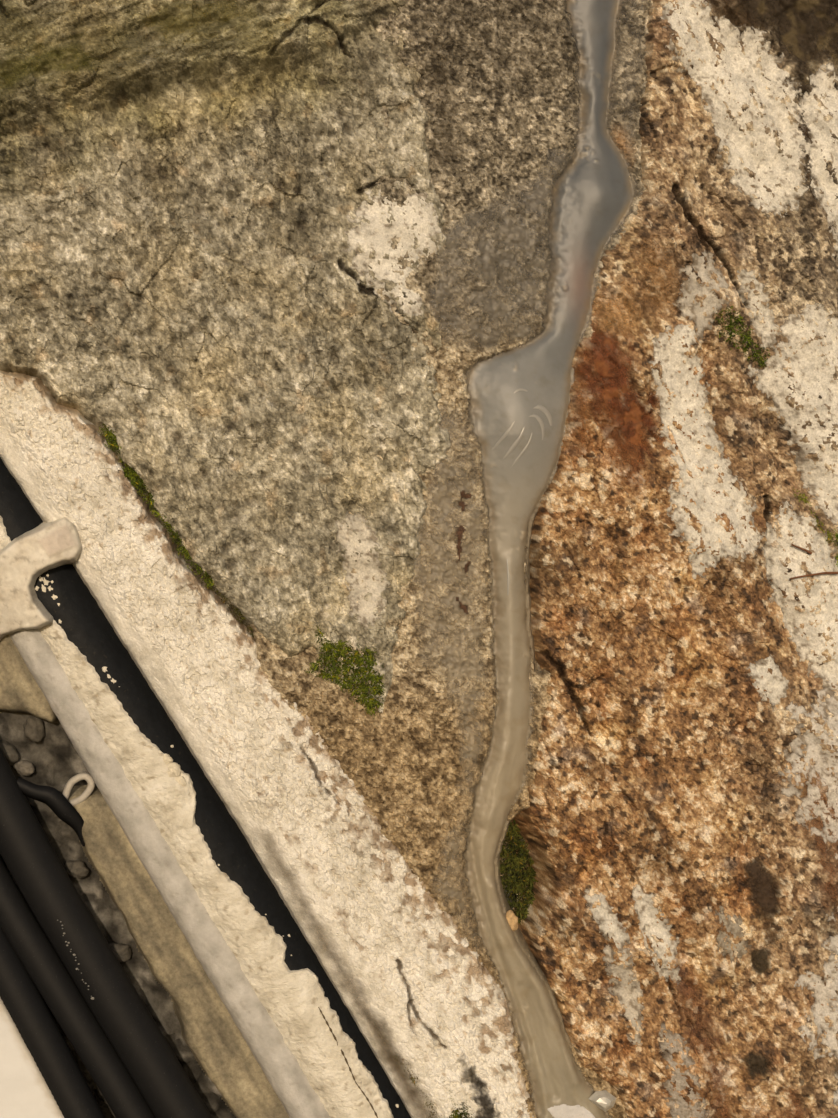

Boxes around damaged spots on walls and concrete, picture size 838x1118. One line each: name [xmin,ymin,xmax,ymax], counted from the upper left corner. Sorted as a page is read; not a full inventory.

crack [396,959,446,1048]